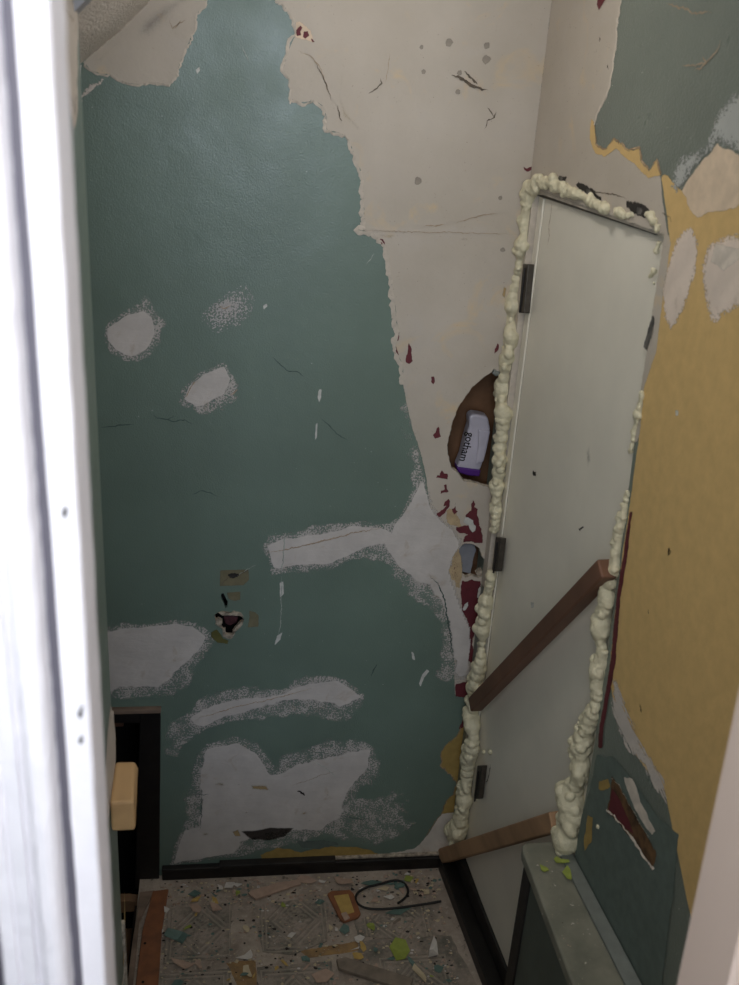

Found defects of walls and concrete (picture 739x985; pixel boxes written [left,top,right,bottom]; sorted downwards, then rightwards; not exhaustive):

peeling [83,0,207,87]
peeling [275,0,739,915]
spalling [215,593,244,639]